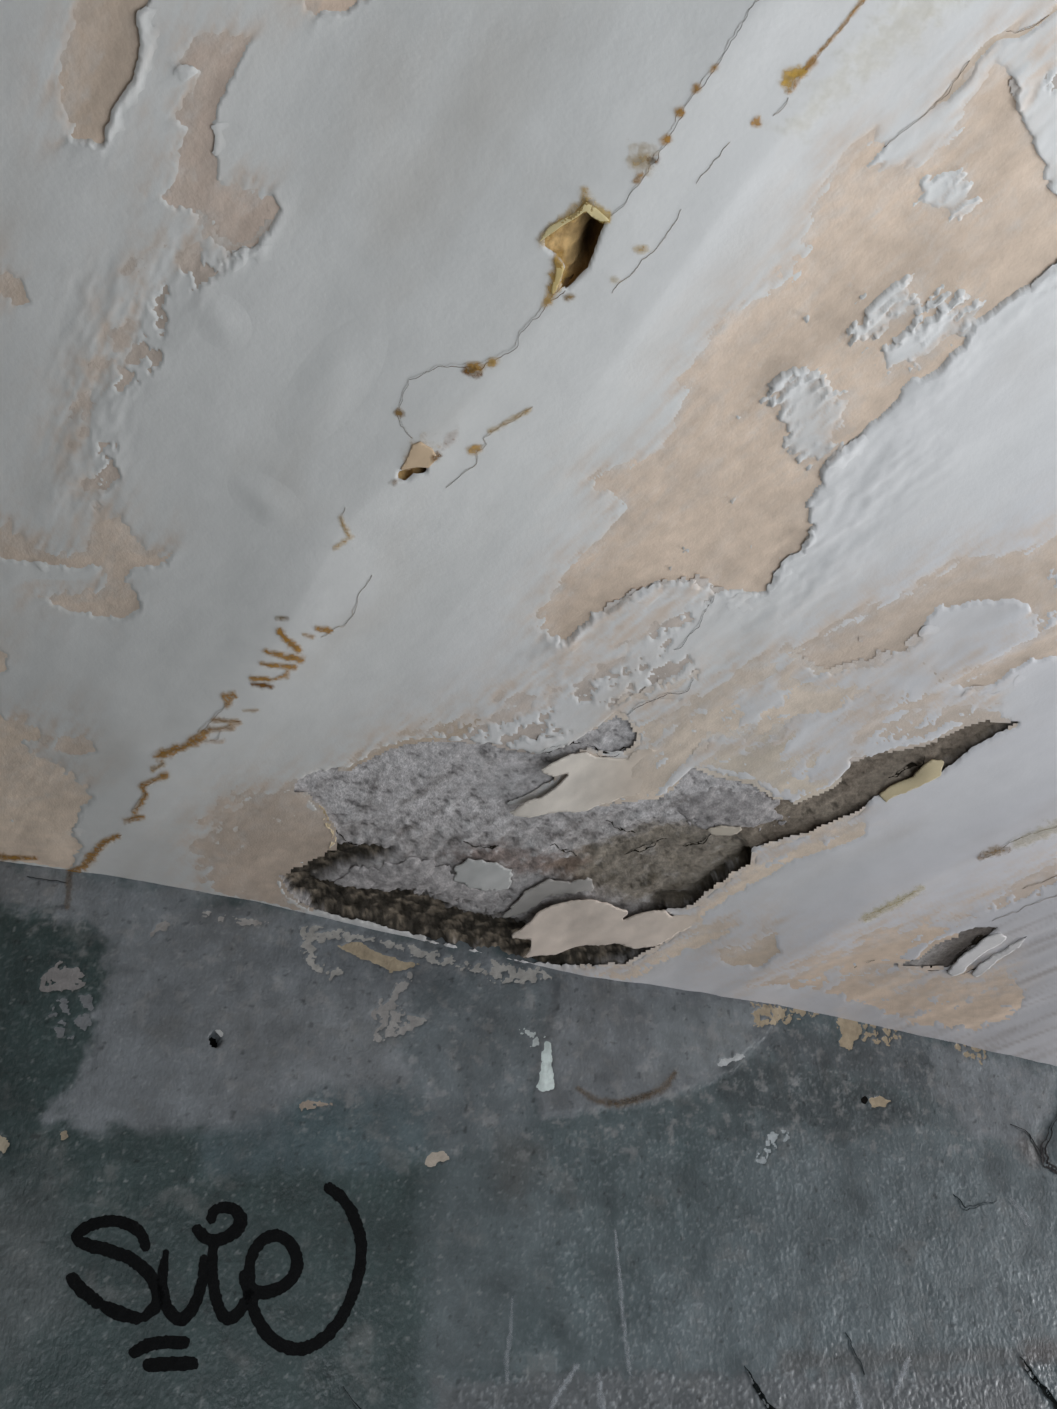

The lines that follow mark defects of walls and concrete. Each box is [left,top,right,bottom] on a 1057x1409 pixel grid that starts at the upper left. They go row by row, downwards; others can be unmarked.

peeling [58,0,160,143]
corrosion [781,0,865,92]
peeling [120,31,280,291]
crack [396,274,574,432]
peeling [0,285,172,618]
peeling [189,4,1057,1065]
corrosion [250,617,333,689]
peeling [0,715,92,869]
corrosion [67,692,256,897]
crack [1010,1116,1057,1174]
crack [744,1366,776,1409]
crack [1021,1357,1057,1409]